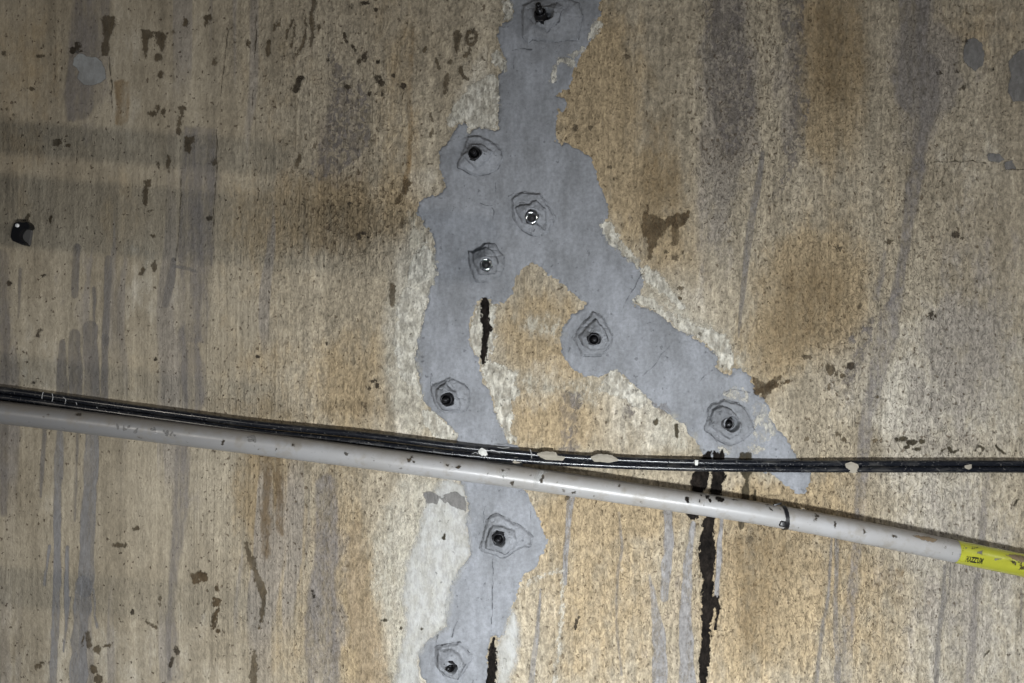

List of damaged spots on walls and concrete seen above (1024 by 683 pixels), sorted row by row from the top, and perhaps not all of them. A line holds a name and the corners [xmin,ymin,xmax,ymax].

damp [57,259,111,401]
damp [599,208,741,370]
damp [690,414,776,501]
damp [723,373,792,400]
damp [40,429,99,683]
damp [527,496,575,662]
damp [651,510,723,683]